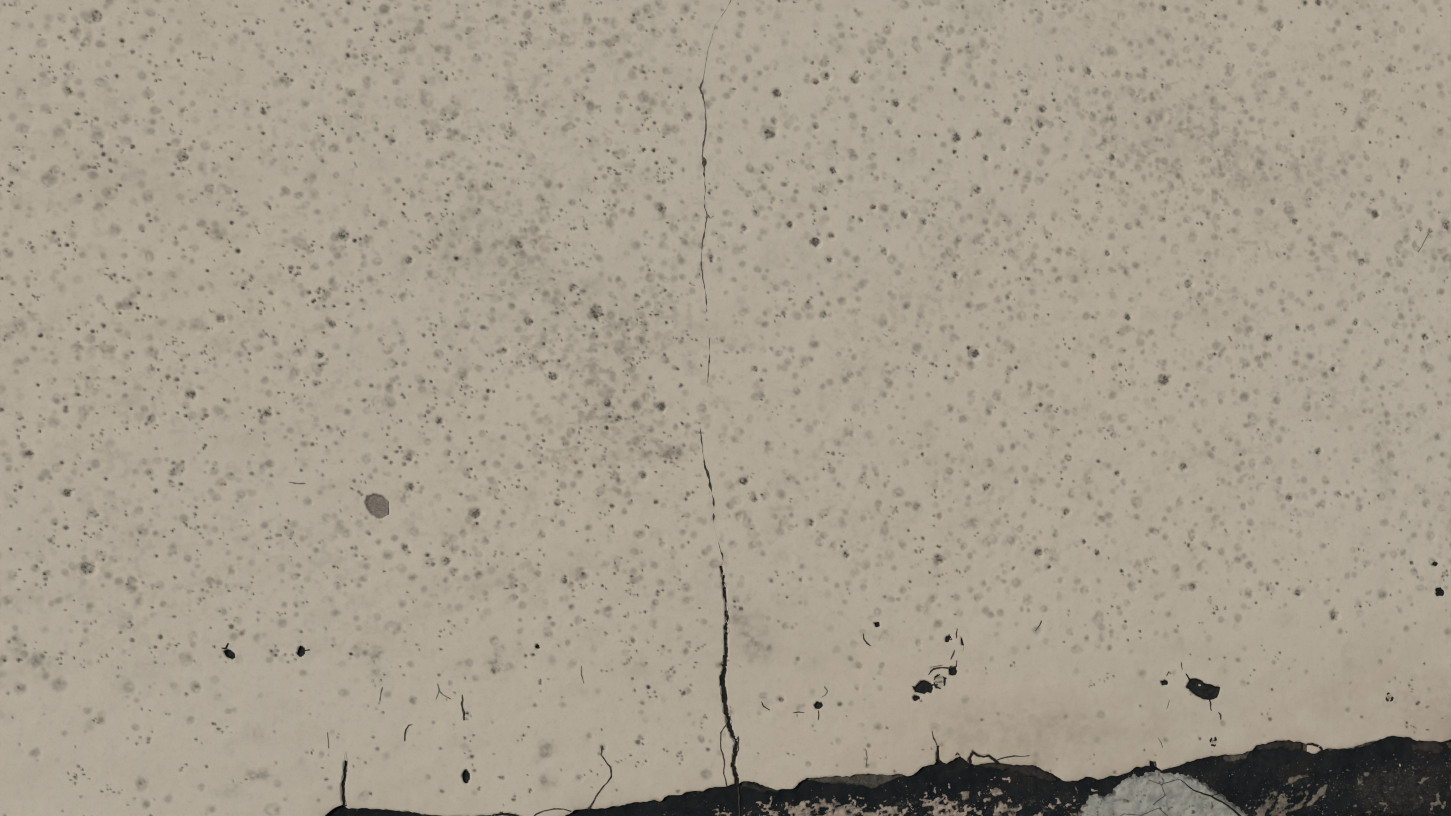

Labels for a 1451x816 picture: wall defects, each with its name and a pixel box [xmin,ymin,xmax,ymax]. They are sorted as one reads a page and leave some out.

crack [699,0,731,383]
crack [700,429,828,816]
spalling [912,667,957,701]
spalling [1161,662,1220,711]
spalling [325,805,441,816]
spalling [565,736,1451,816]